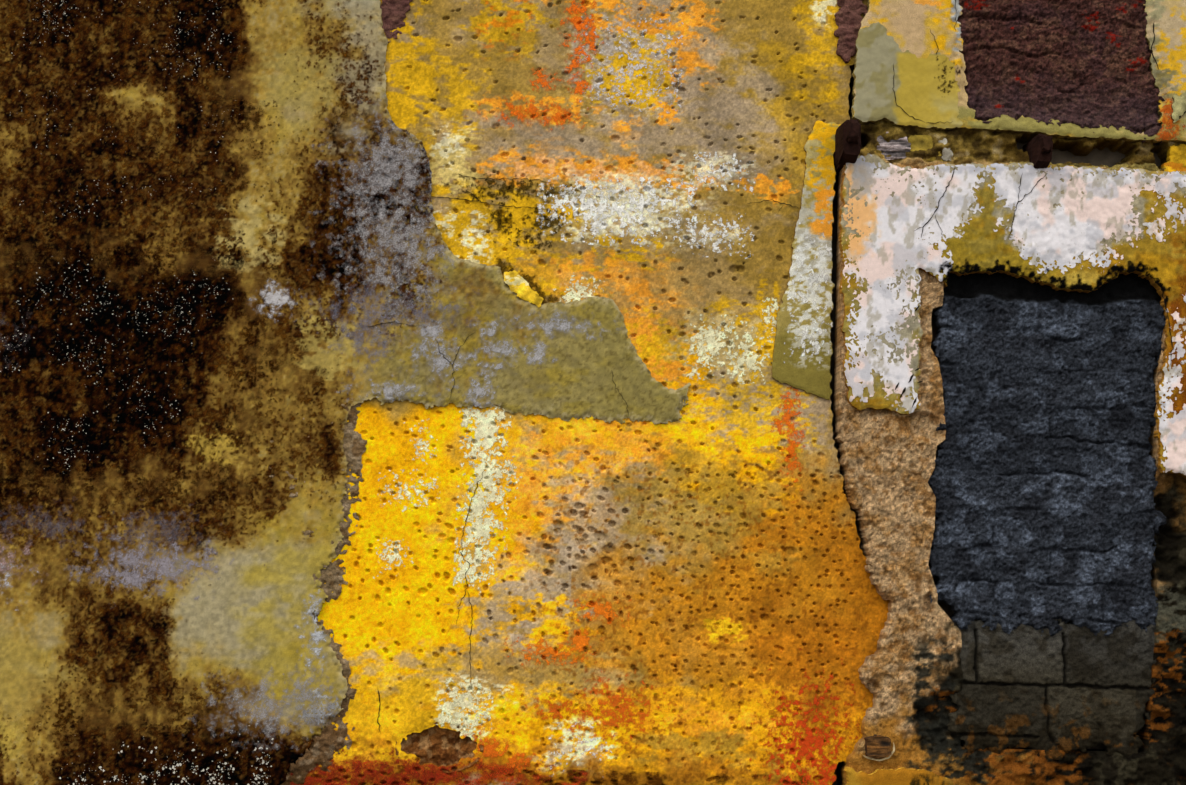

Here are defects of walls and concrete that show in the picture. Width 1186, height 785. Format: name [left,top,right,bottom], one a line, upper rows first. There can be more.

crack [916,166,956,236]
leakage [0,0,600,785]
spalling [280,0,1186,785]
crack [456,471,484,689]
leakage [567,769,667,785]
corrosion [749,670,858,785]